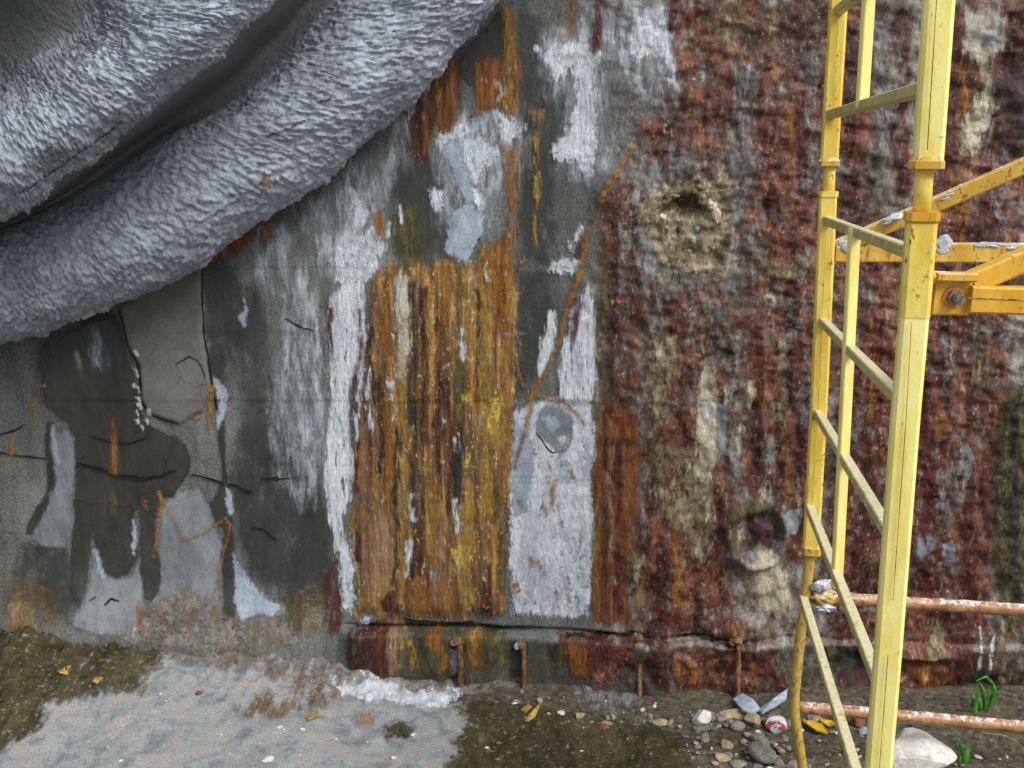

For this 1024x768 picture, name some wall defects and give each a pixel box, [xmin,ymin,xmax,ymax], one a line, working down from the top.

damp [799,52,823,190]
corrosion [933,0,1024,196]
spalling [637,166,734,284]
crack [91,305,177,445]
crack [175,267,217,410]
damp [22,1,815,644]
corrosion [286,0,829,695]
crack [77,463,289,493]
corrosion [820,347,891,643]
corrosion [899,286,1016,689]
damp [329,669,468,710]
crack [403,617,523,638]